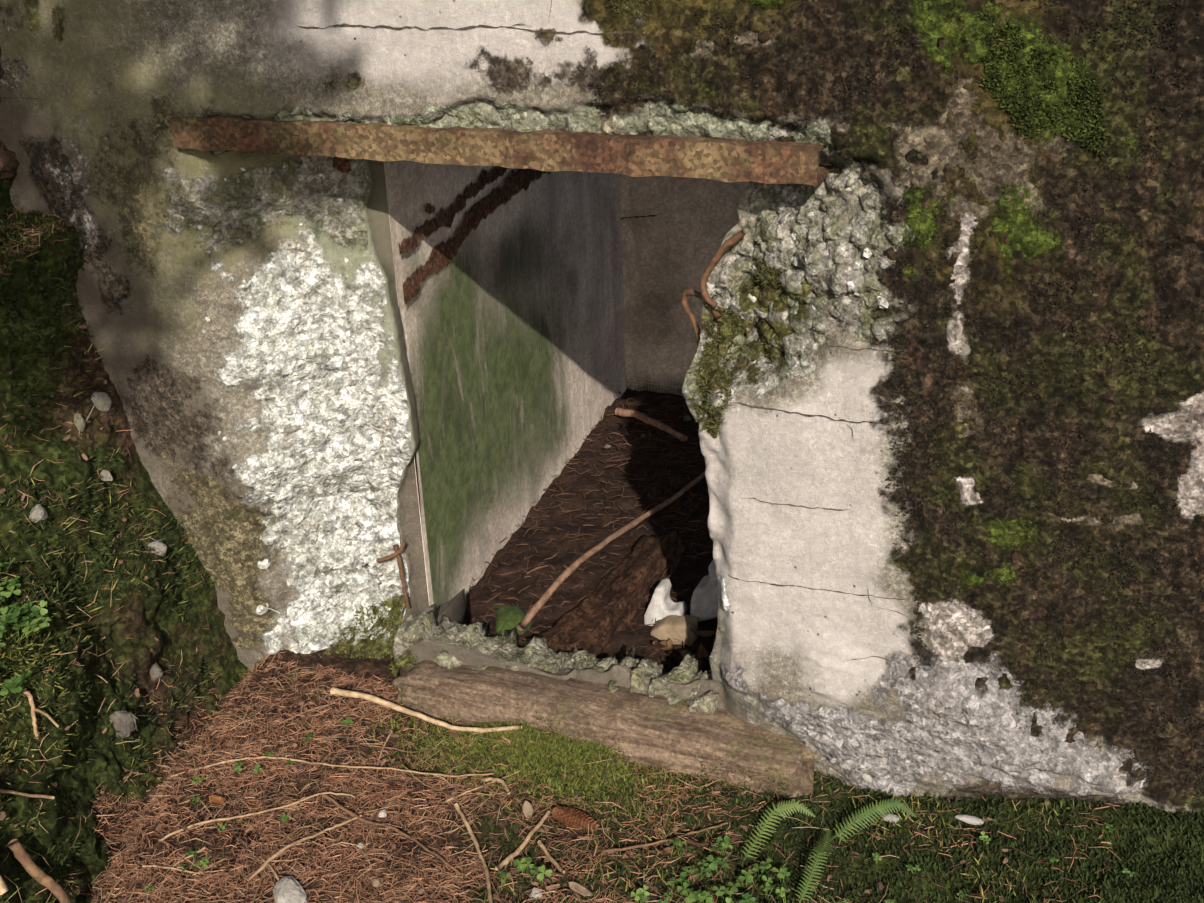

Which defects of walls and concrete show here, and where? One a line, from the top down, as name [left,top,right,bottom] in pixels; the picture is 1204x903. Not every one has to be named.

crack [299,0,631,35]
rust [332,157,351,173]
rust [399,166,552,305]
spalling [213,100,913,412]
spalling [152,155,412,658]
crack [735,402,895,439]
peeling [1140,391,1204,519]
crack [743,498,849,511]
crack [730,576,912,617]
peeling [918,600,994,662]
peeling [1135,659,1164,670]
spalling [710,640,967,797]